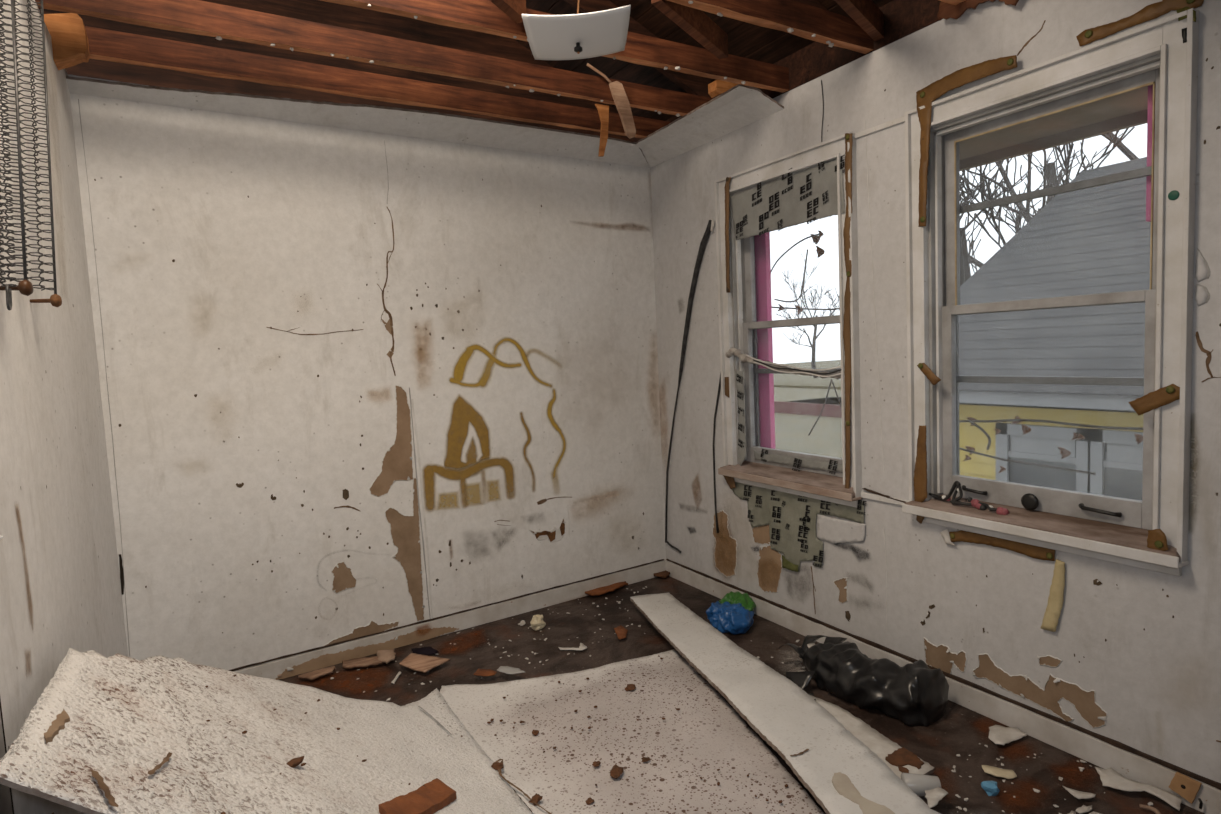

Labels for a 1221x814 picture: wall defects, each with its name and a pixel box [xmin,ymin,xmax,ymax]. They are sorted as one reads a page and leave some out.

crack [267,207,396,376]
crack [1195,331,1221,382]
peeling [369,385,425,621]
peeling [331,561,357,594]
peeling [712,510,737,577]
peeling [752,524,783,593]
peeling [323,620,399,646]
peeling [920,604,1108,728]